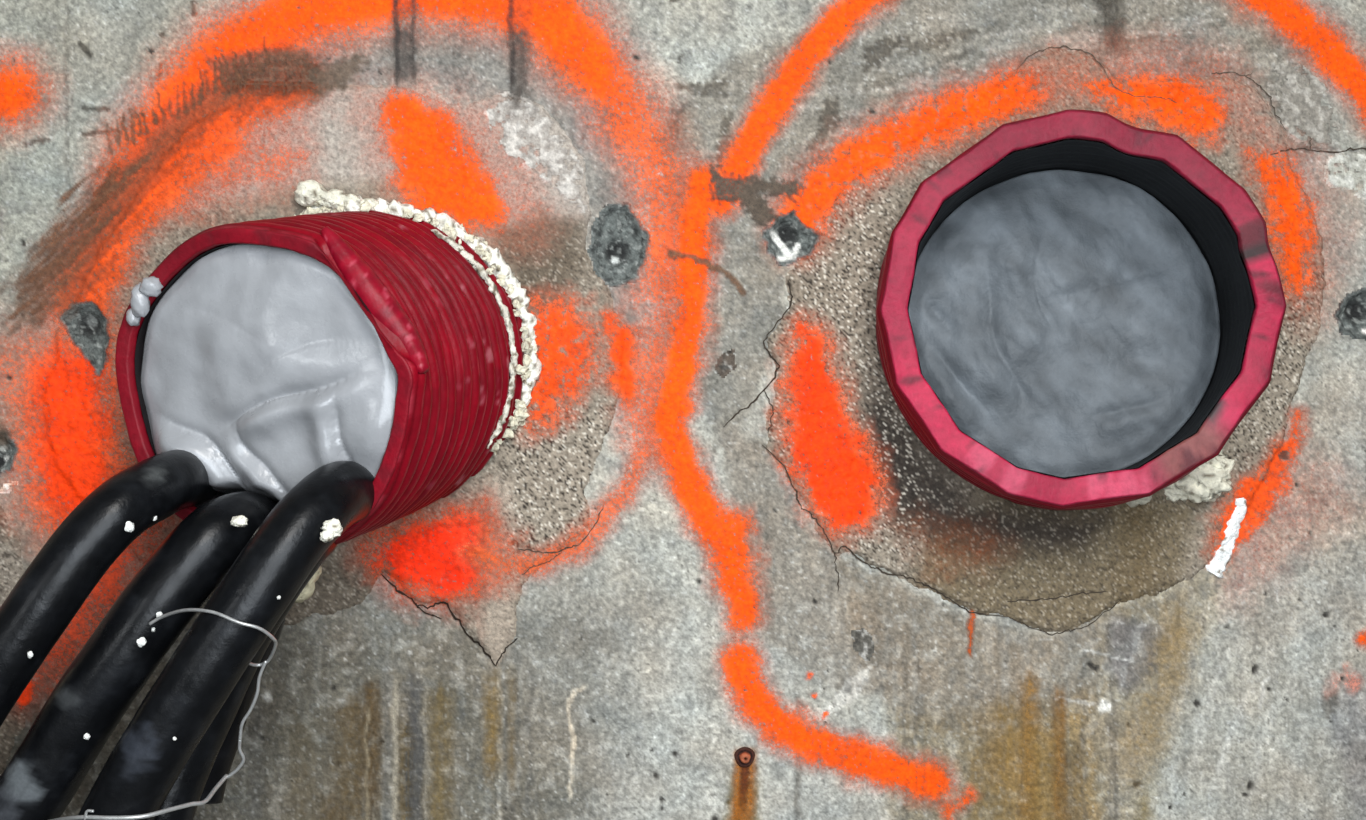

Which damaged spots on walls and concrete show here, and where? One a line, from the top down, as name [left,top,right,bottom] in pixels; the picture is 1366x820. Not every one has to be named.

leakage [394,0,414,79]
leakage [508,5,527,103]
crack [1017,45,1176,103]
crack [1211,72,1366,155]
rust [732,758,756,820]